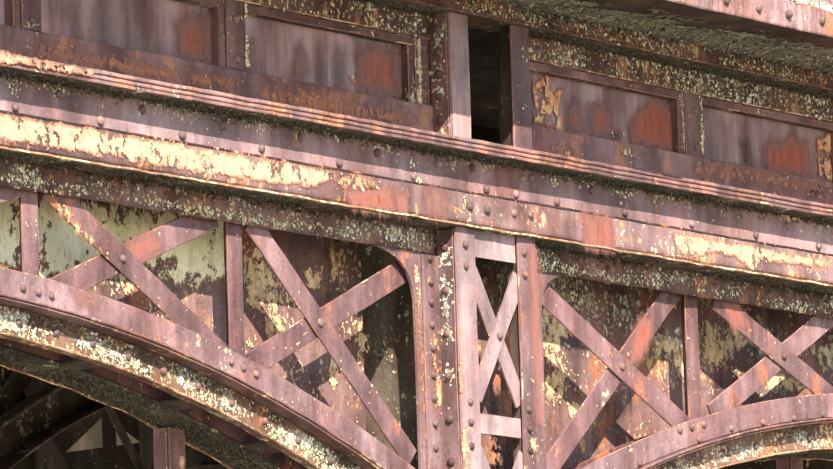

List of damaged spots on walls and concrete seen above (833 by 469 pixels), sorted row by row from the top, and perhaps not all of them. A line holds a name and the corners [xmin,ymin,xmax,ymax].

peeling [791,0,833,14]
peeling [0,50,94,77]
peeling [0,113,380,191]
rust [260,43,421,127]
peeling [532,75,566,131]
rust [588,96,673,152]
rust [694,133,833,196]
peeling [0,198,20,271]
peeling [242,247,295,348]
peeling [303,246,345,292]
peeling [670,231,826,271]
peeling [542,308,581,419]